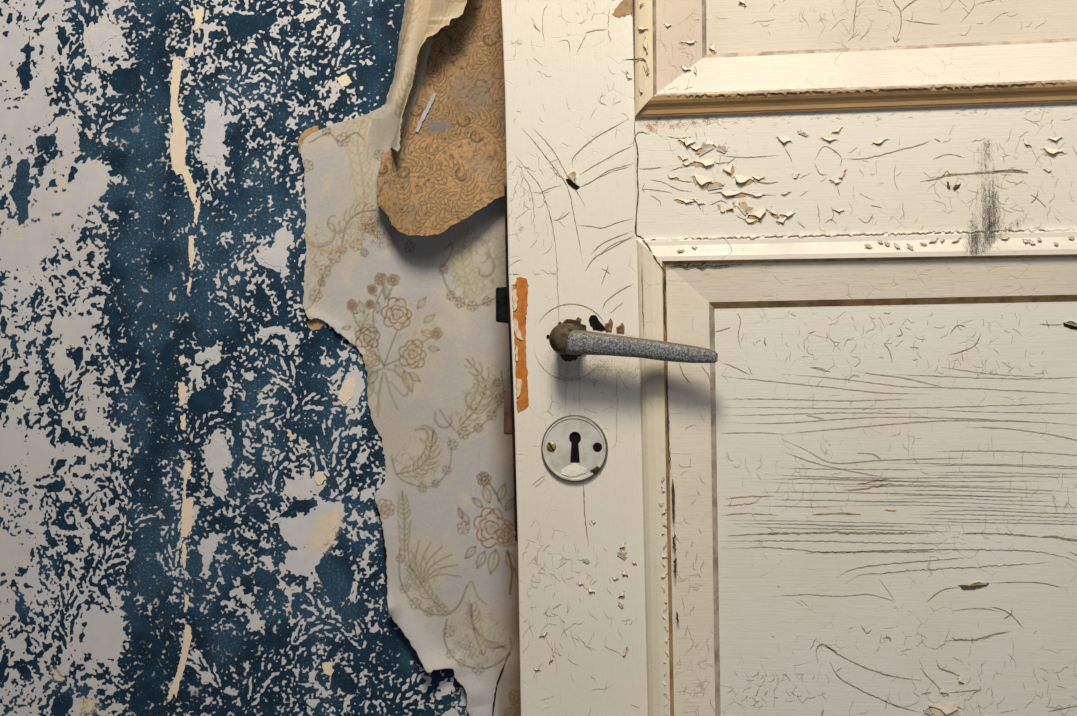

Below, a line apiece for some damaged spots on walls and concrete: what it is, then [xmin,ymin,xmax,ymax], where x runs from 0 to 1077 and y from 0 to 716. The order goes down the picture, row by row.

peeling [192,8,204,31]
peeling [337,73,352,88]
peeling [170,46,200,294]
peeling [674,137,797,225]
crack [508,0,1077,322]
peeling [178,344,219,430]
peeling [338,378,354,404]
peeling [208,439,229,492]
peeling [181,460,194,571]
crack [674,312,1077,716]
peeling [167,594,200,701]
peeling [322,661,334,676]